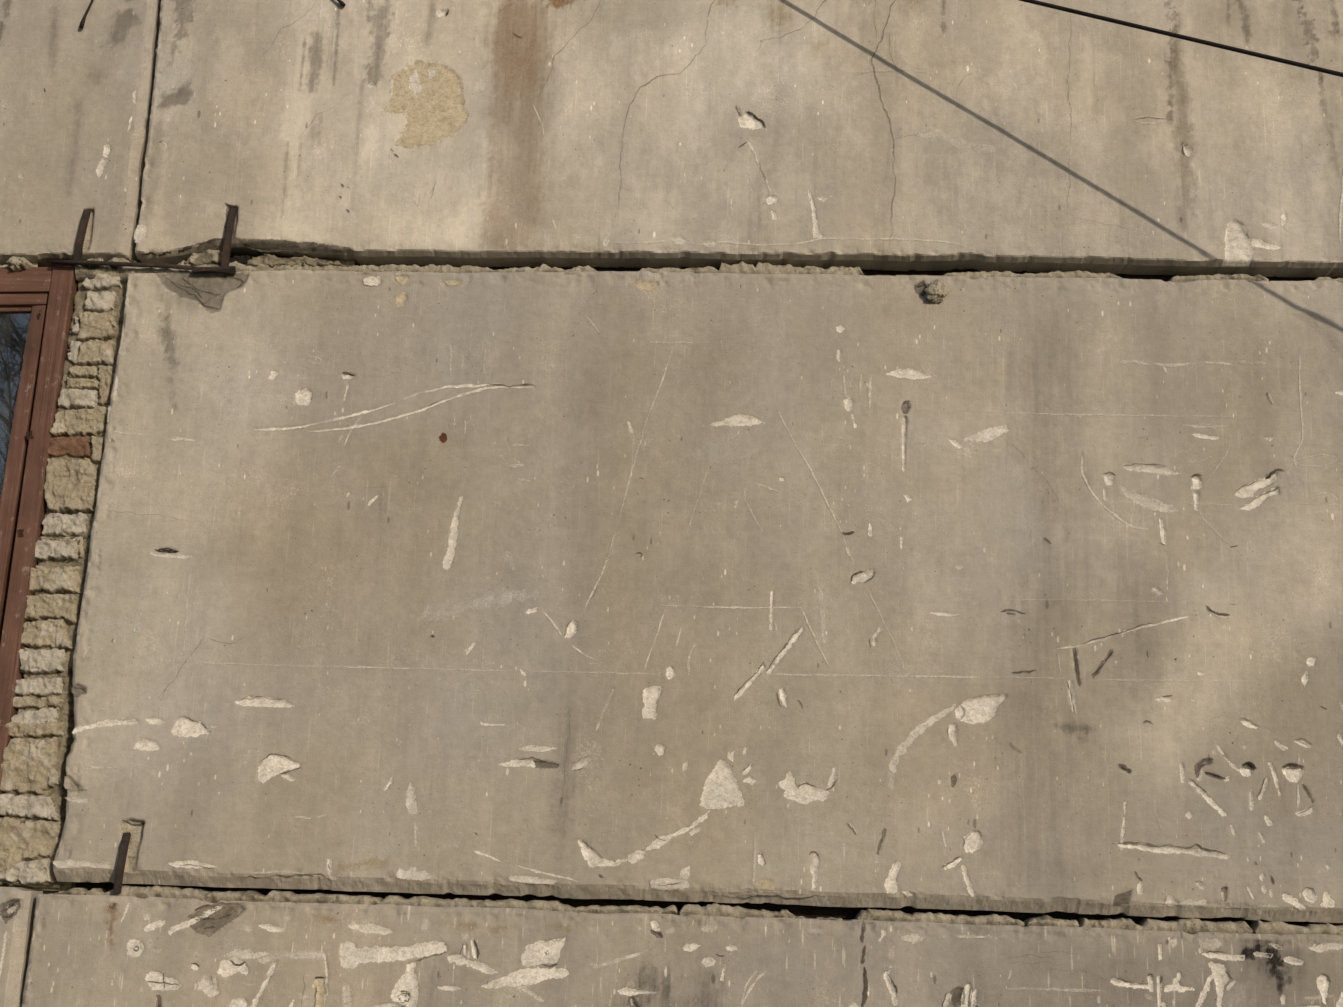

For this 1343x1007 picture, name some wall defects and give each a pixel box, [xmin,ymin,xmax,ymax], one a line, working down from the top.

peeling [370,60,469,158]
spalling [134,717,218,751]
spalling [257,753,300,783]
spalling [578,747,756,878]
spalling [779,766,838,804]
spalling [889,694,1005,773]
spalling [145,957,276,1007]
spalling [289,937,569,1007]